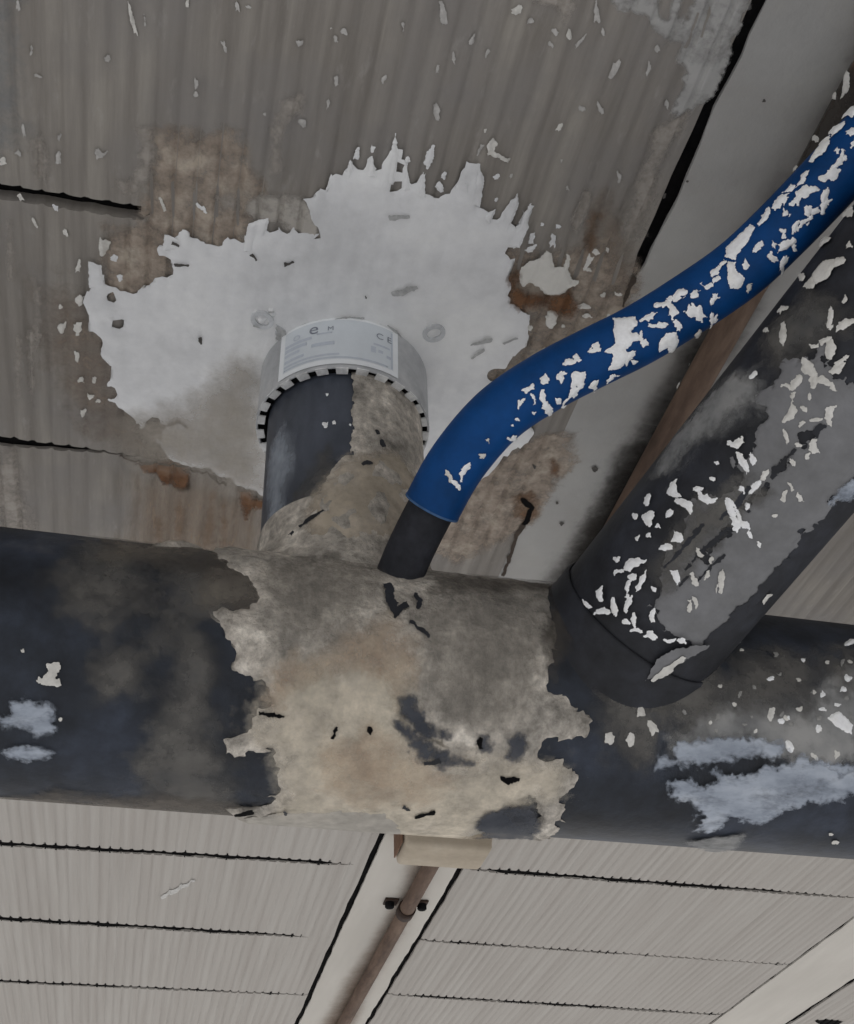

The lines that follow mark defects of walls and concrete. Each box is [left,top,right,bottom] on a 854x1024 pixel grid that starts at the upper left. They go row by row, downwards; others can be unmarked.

crack [622,0,765,307]
crack [0,184,141,210]
water stain [105,127,266,295]
spalling [391,286,418,296]
corrosion [508,273,578,317]
spalling [470,337,518,359]
crack [0,436,227,486]
corrosion [140,460,190,488]
corrosion [238,490,263,520]